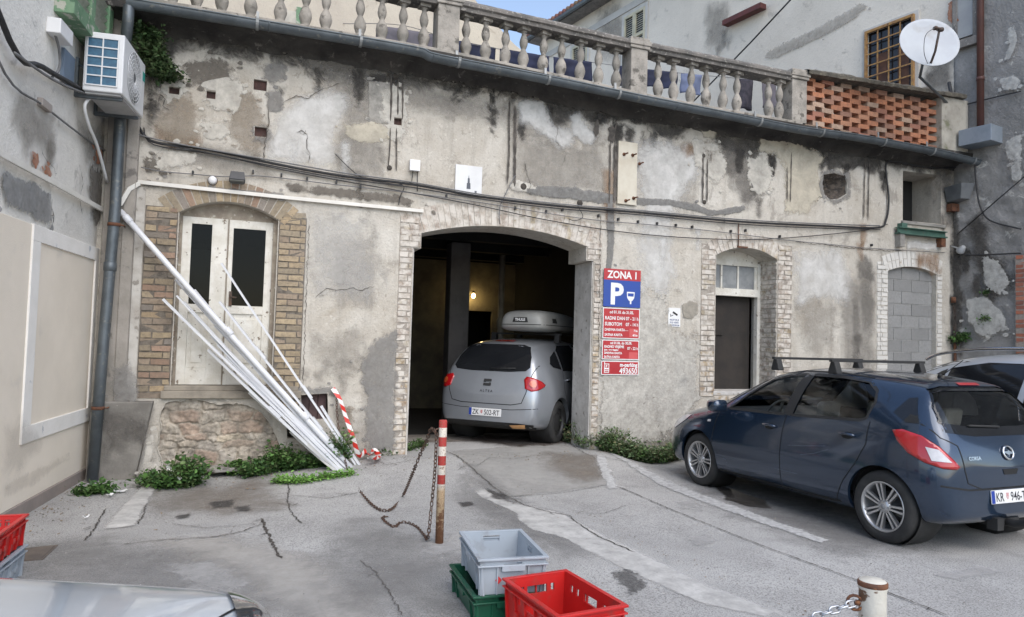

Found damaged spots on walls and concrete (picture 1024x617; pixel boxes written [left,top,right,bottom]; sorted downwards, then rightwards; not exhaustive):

leakage [145,66,161,119]
peeling [143,50,287,187]
leakage [161,37,698,297]
leakage [714,133,776,216]
peeling [746,139,851,214]
peeling [1005,131,1024,187]
crack [301,229,369,382]
peeling [959,251,1015,339]
crack [84,509,106,540]
crack [126,492,283,558]
crack [286,475,362,523]